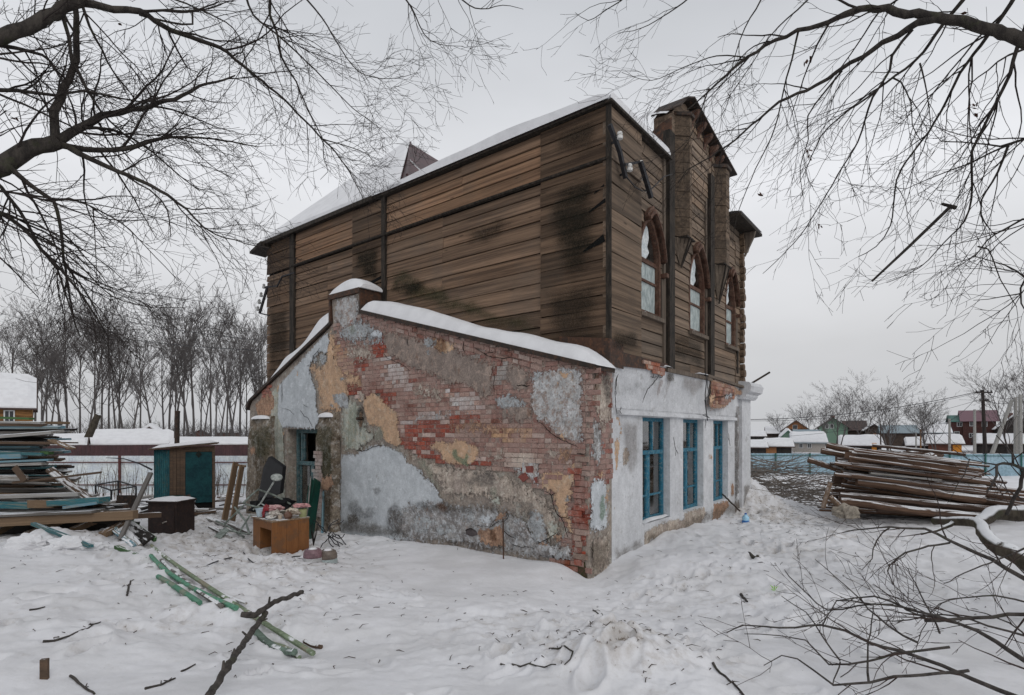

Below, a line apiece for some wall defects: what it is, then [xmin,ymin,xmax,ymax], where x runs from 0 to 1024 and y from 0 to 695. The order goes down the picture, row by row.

spalling [297,295,630,578]
spalling [706,380,742,410]